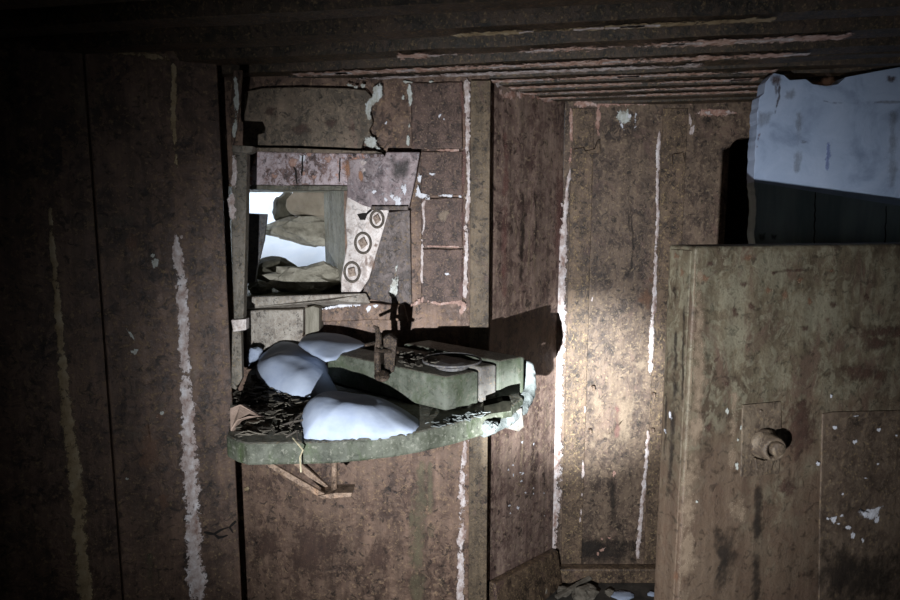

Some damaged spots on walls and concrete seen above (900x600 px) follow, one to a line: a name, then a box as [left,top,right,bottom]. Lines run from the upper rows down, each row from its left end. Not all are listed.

peeling [289,33,855,559]
peeling [859,506,883,523]